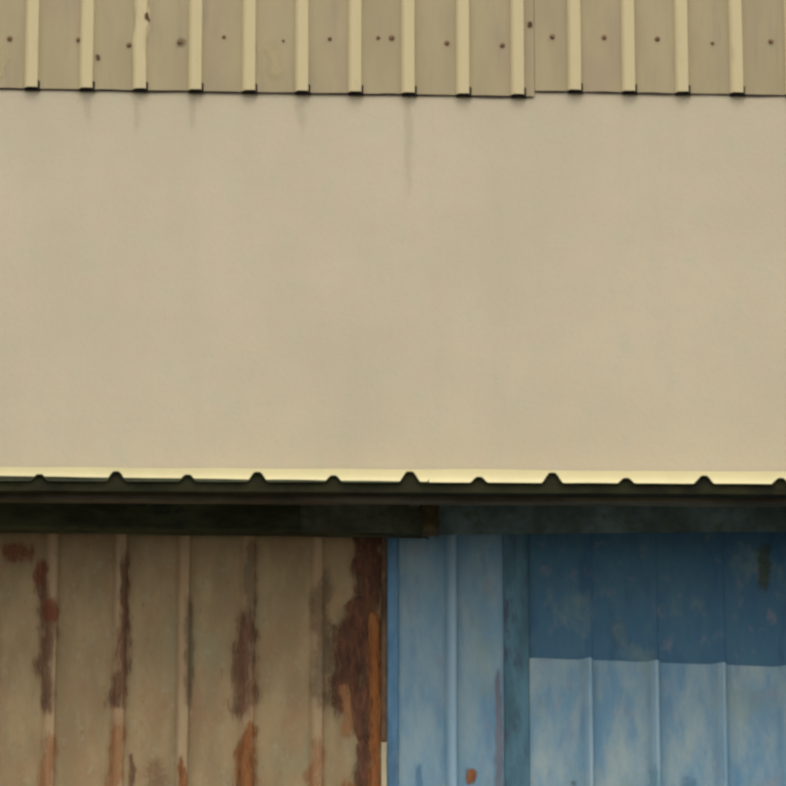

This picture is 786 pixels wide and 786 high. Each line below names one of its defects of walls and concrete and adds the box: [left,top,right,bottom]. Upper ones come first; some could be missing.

rust [3,544,59,712]
rust [109,555,131,708]
rust [233,613,258,717]
rust [327,538,381,786]
rust [107,725,135,786]
rust [233,722,257,786]
rust [466,768,477,784]